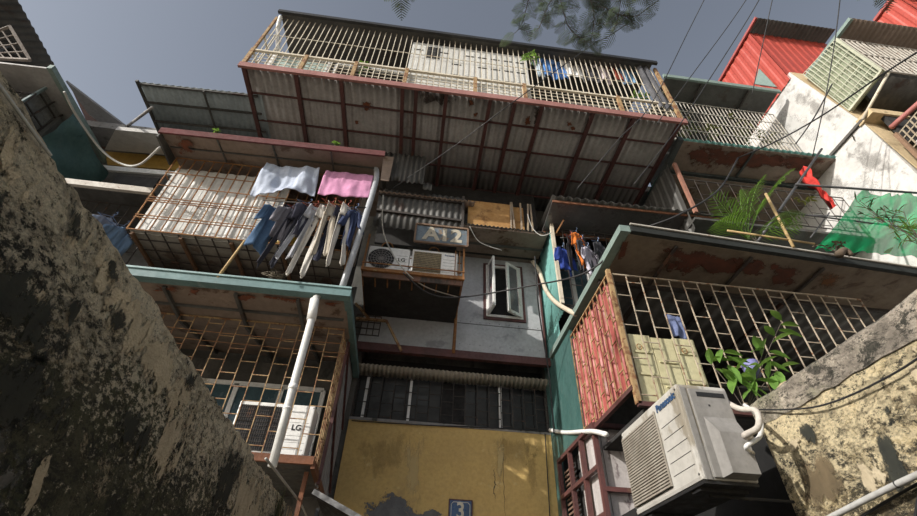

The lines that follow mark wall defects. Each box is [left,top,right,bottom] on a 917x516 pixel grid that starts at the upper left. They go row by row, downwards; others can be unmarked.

corrosion [687,145,832,172]
corrosion [663,248,797,286]
damp [109,305,126,331]
damp [0,250,82,441]
damp [876,407,908,492]
damp [800,452,844,512]
spalling [364,488,442,516]